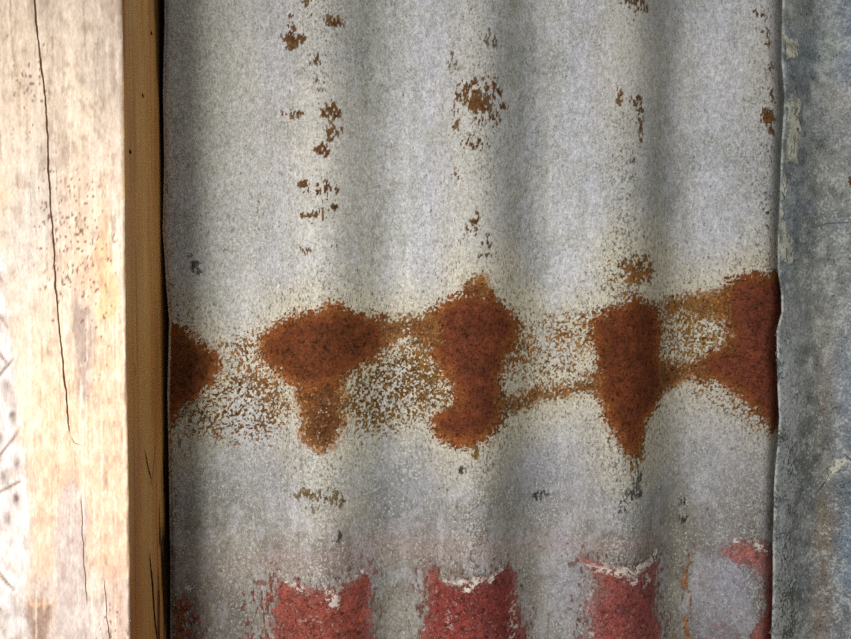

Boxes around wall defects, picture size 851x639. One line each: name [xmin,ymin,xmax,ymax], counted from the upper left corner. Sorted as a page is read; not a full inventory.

rust [280,13,307,51]
rust [313,99,343,158]
rust [448,51,509,151]
rust [616,87,645,162]
crack [34,0,76,444]
rust [297,179,340,224]
rust [463,210,492,258]
rust [170,250,802,591]
peeling [239,556,386,639]
peeling [406,555,534,639]
peeling [568,543,671,639]
peeling [703,537,773,639]